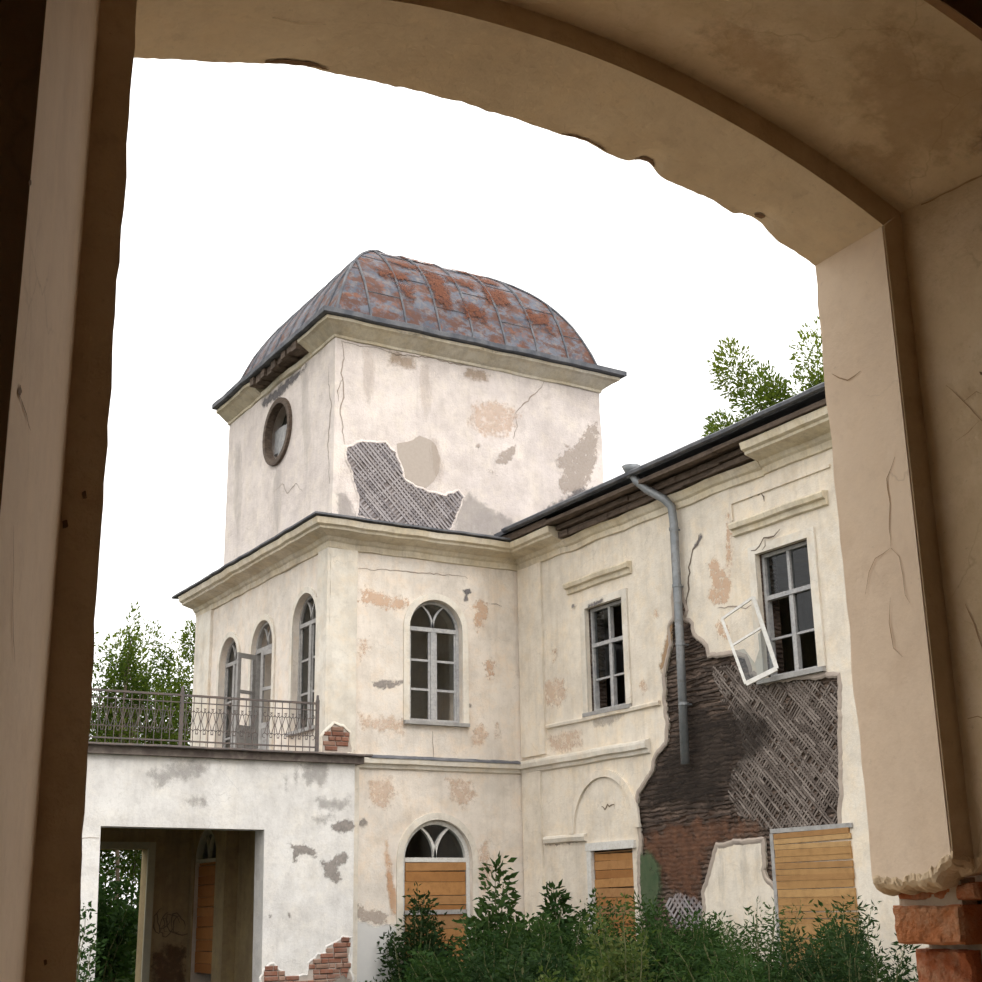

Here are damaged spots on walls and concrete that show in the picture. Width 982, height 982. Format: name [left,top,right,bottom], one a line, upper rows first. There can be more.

rust [375,256,554,335]
crack [327,341,479,484]
flaking render [344,436,465,530]
flaking render [557,425,599,494]
crack [686,536,699,604]
crack [865,457,909,649]
flaking render [319,721,354,754]
flaking render [635,588,844,931]
flaking render [291,845,347,883]
flaking render [873,848,982,982]
flaking render [259,935,354,982]